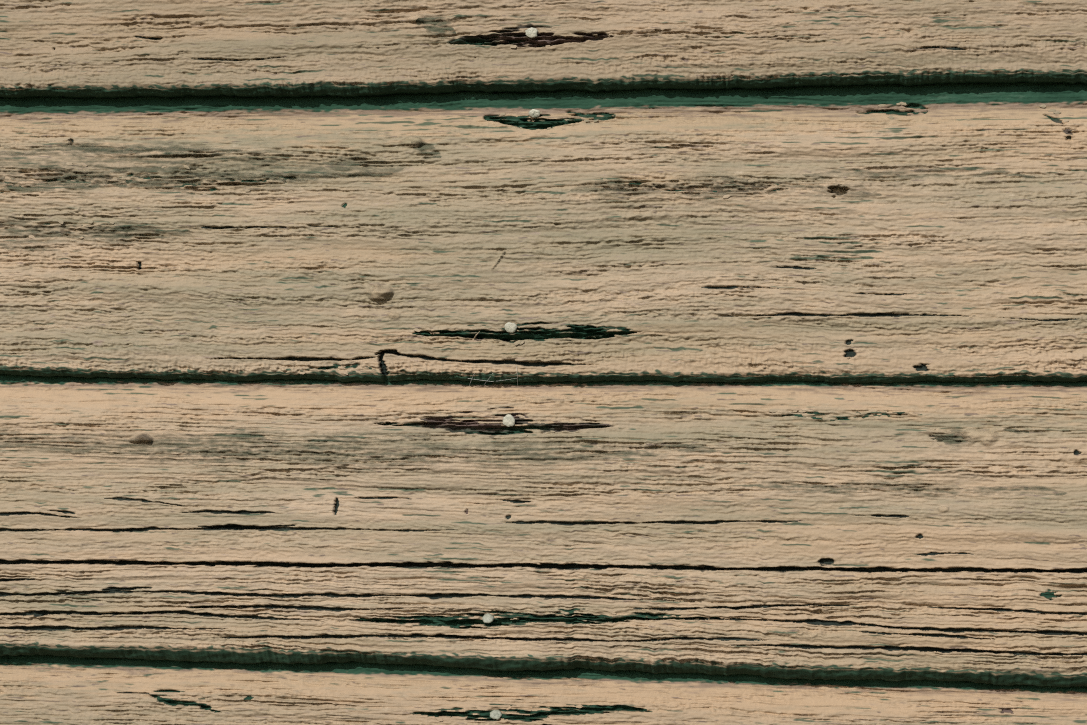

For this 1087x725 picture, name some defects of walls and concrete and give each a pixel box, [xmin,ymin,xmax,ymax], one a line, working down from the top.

crack [219,350,586,375]
crack [0,497,455,532]
crack [503,500,801,525]
crack [855,512,909,520]
crack [917,550,973,558]
crack [0,578,1087,656]